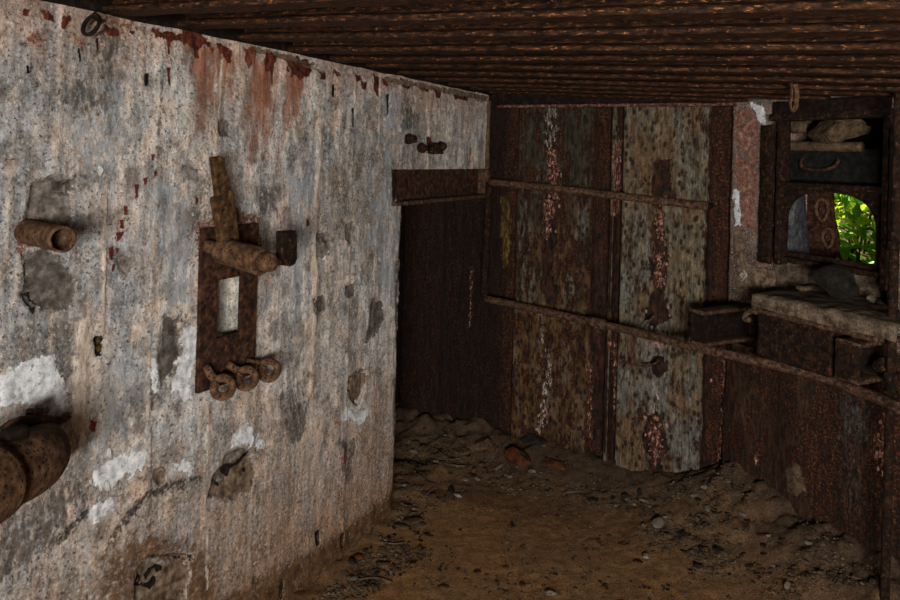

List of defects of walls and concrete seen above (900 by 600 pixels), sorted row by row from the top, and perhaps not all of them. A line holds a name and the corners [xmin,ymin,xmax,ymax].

spalling [24,47,151,229]
corrosion [103,16,340,151]
peeling [732,102,776,293]
peeling [0,354,71,417]
spalling [18,248,78,315]
peeling [88,168,200,525]
spalling [208,422,265,503]
corrosion [642,159,674,472]
corrosion [870,413,899,476]